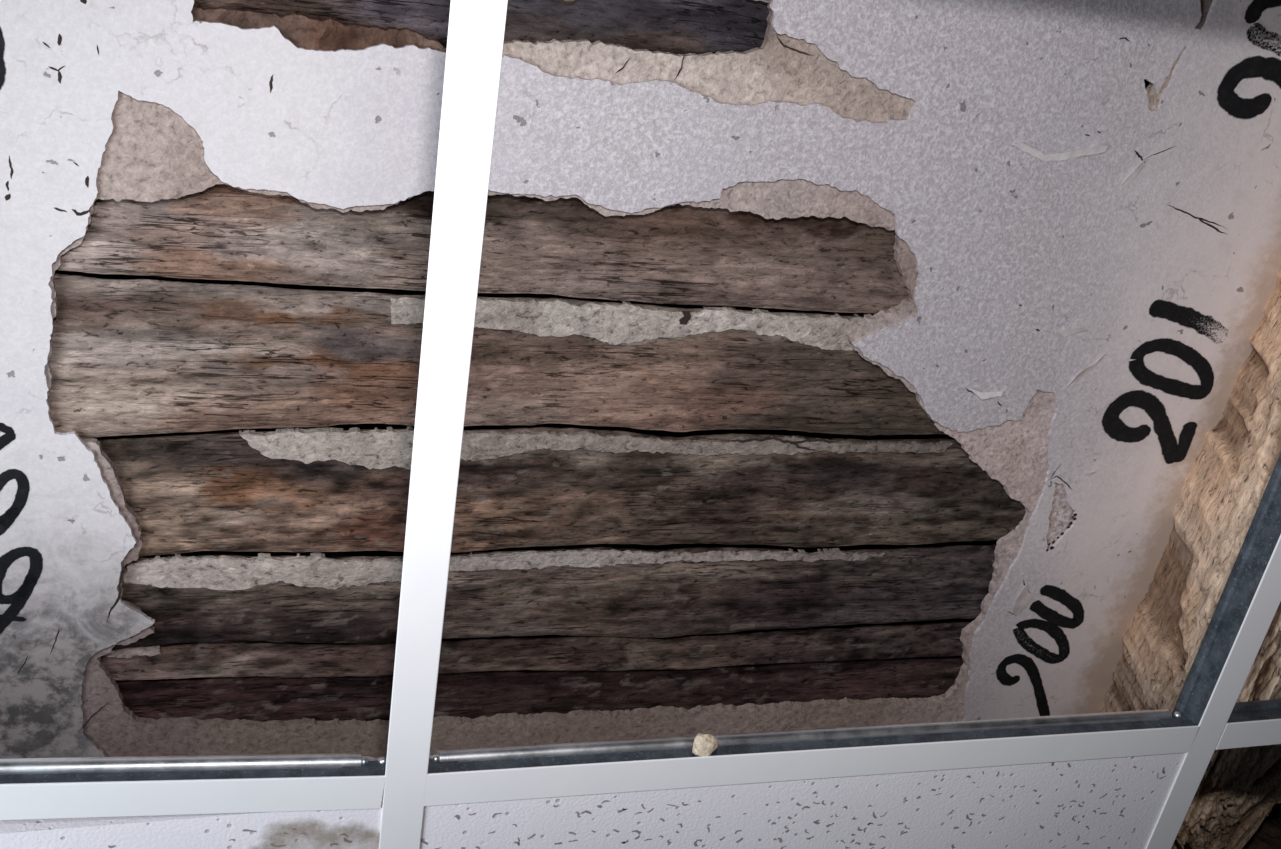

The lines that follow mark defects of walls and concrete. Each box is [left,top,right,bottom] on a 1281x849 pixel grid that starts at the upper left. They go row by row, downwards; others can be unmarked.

flaking render [191,5,447,52]
flaking render [502,0,915,122]
peeling [1195,0,1213,29]
flaking render [49,91,422,318]
flaking render [390,295,425,325]
flaking render [45,334,53,419]
flaking render [239,426,414,469]
flaking render [430,179,1106,755]
flaking render [80,438,403,612]
flaking render [81,625,390,758]
water stain [270,824,380,849]
flaking render [1242,808,1281,849]